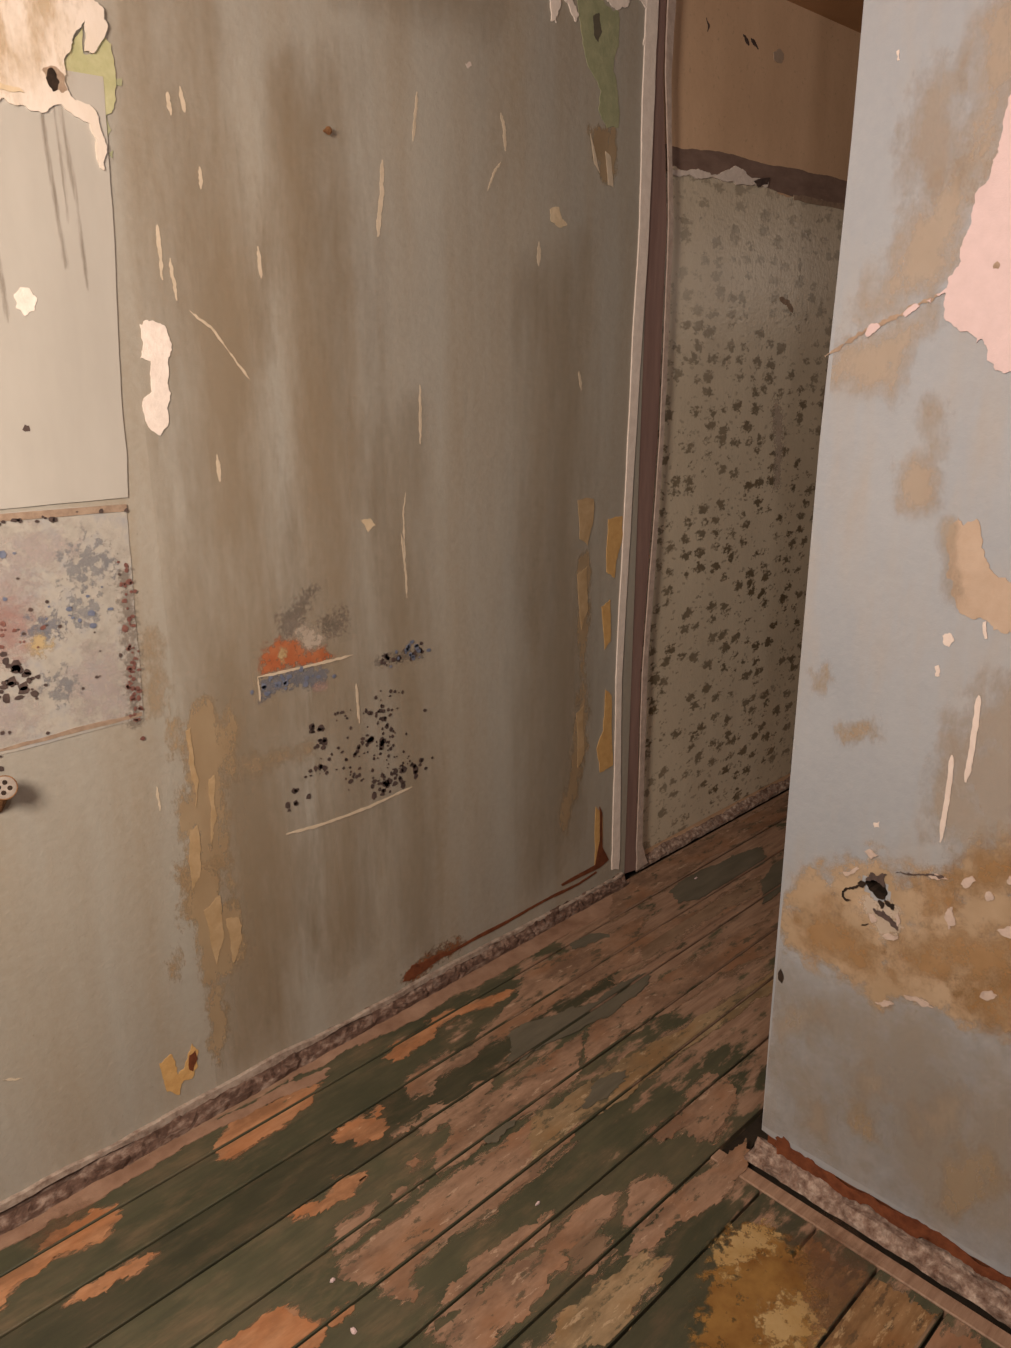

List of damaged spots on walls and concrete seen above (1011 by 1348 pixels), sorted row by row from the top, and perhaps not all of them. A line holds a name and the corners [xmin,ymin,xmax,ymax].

peeling [0,0,122,171]
peeling [549,0,647,128]
flaking render [944,95,1011,373]
peeling [140,320,172,436]
peeling [946,518,1011,639]
peeling [559,498,623,831]
peeling [159,696,312,1095]
spalling [865,880,901,941]